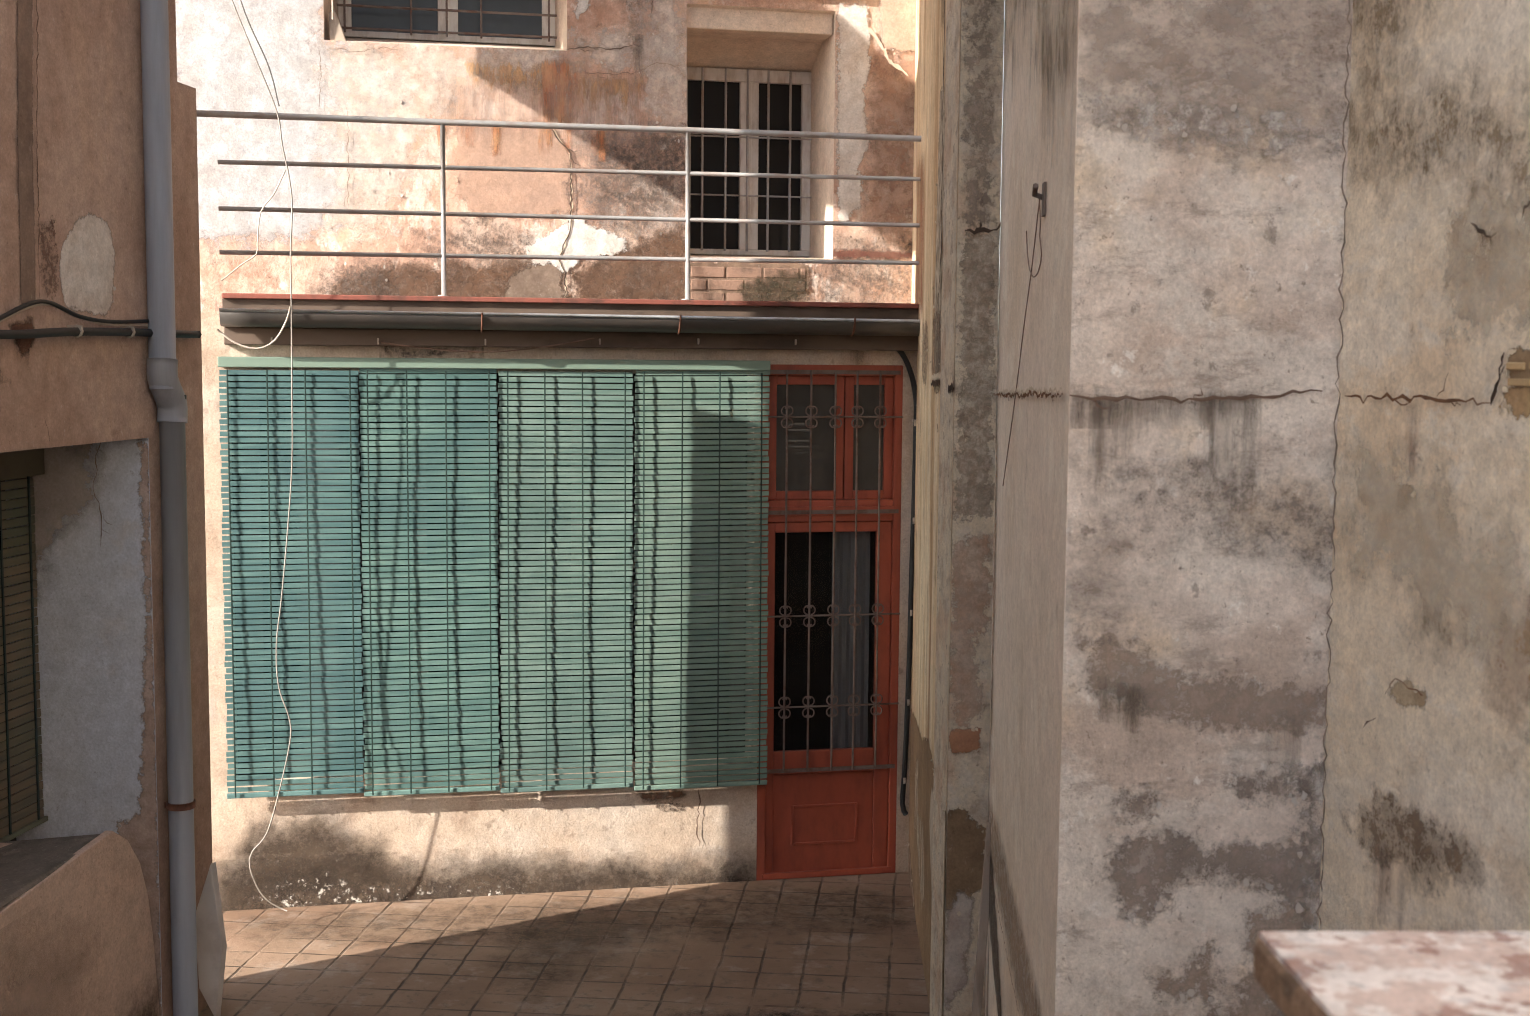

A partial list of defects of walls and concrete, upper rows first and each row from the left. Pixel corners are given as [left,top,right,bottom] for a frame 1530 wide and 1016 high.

damp [311,131,691,300]
damp [737,236,912,303]
crack [866,0,1001,432]
damp [961,0,1409,227]
damp [1352,81,1530,196]
spalling [921,86,999,753]
crack [994,0,1505,927]
spalling [1499,345,1530,420]
damp [1078,613,1327,736]
damp [220,818,757,911]
damp [908,707,1039,1016]
damp [1358,791,1476,891]